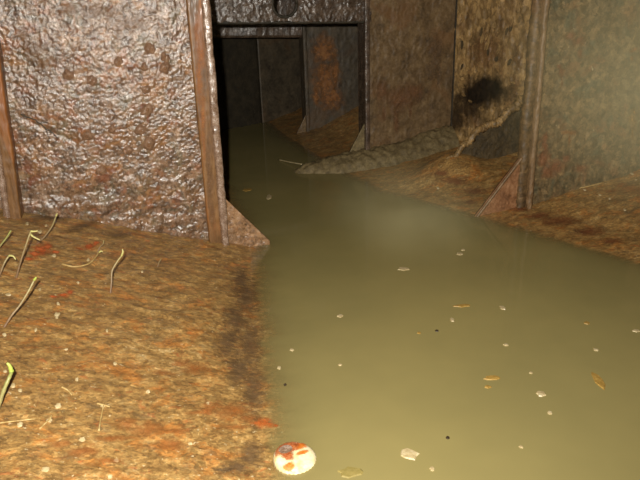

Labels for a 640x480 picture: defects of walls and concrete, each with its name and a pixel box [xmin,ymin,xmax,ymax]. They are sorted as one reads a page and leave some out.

corrosion [144,42,171,74]
corrosion [62,69,74,81]
corrosion [134,103,156,150]